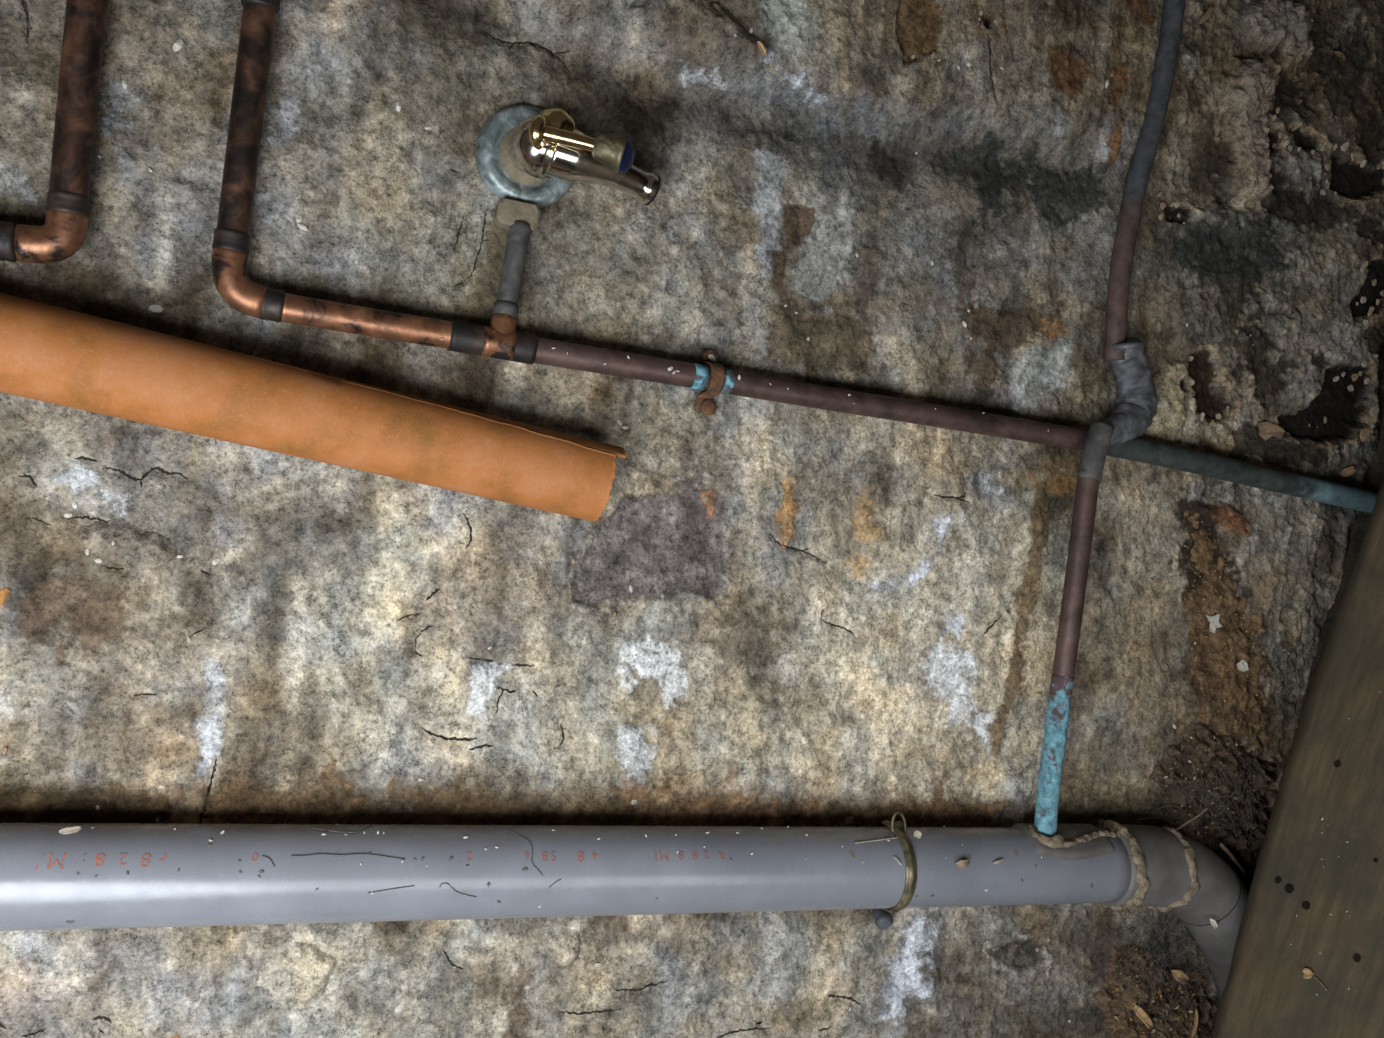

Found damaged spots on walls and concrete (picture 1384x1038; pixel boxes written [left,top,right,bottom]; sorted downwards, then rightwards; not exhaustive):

crack [21,0,31,44]
peeling [1271,107,1384,196]
water stain [742,149,882,392]
water stain [948,132,1107,417]
peeling [1356,261,1384,325]
peeling [1190,381,1229,426]
peeling [1259,422,1285,441]
peeling [1324,350,1369,391]
rust [0,588,10,605]
water stain [924,482,1051,757]
water stain [616,633,688,708]
water stain [879,917,938,1038]